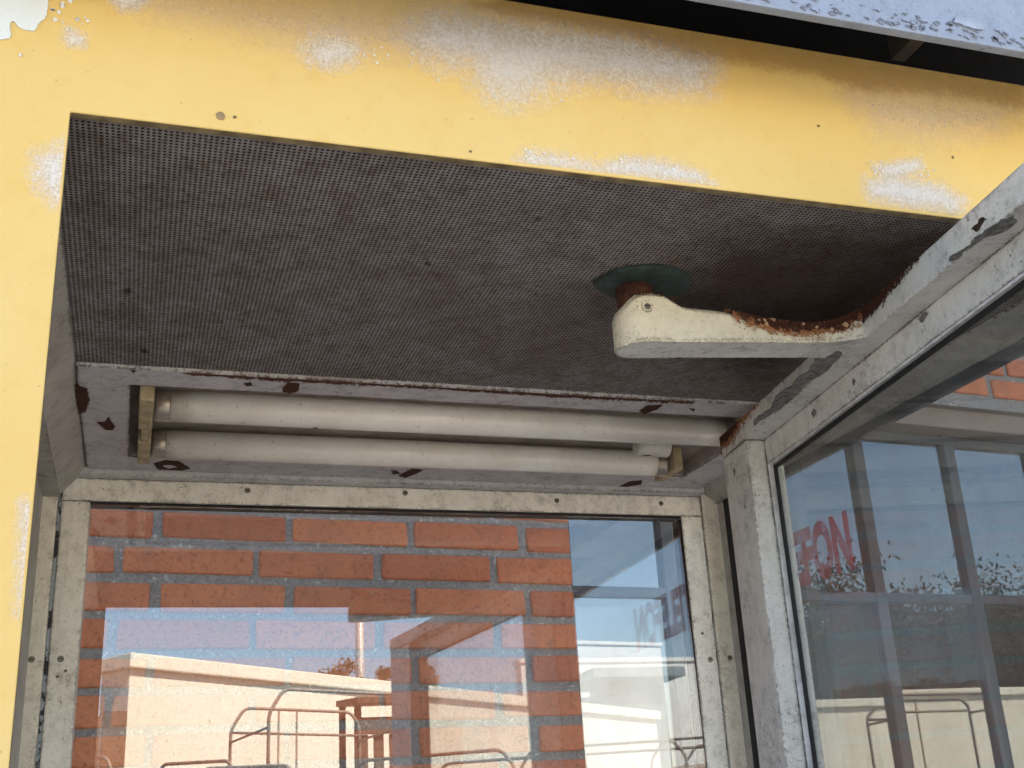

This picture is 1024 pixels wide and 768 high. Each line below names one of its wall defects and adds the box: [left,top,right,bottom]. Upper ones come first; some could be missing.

peeling [0,0,96,45]
peeling [791,0,850,17]
peeling [865,7,1024,48]
peeling [949,215,1017,262]
rust [702,237,931,338]
rust [75,385,90,414]
rust [181,372,695,404]
peeling [753,351,842,427]
rust [719,394,768,455]